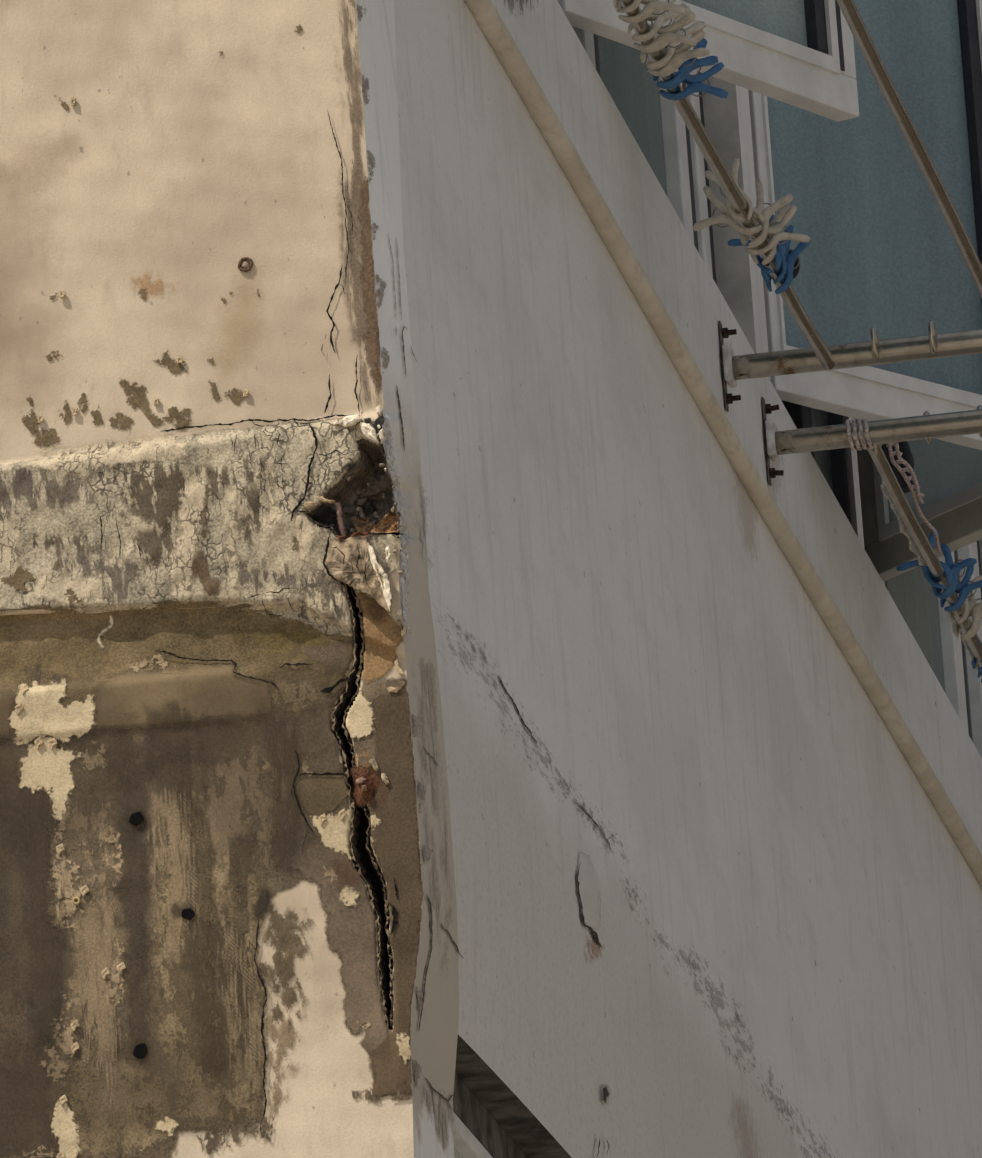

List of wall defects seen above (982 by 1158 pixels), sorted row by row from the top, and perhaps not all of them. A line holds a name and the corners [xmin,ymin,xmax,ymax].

spalling [362,75,370,104]
peeling [153,350,186,375]
crack [161,110,360,523]
peeling [358,150,390,391]
water stain [0,462,186,647]
peeling [0,377,411,756]
water stain [205,457,266,544]
crack [158,535,463,1030]
flaking render [296,775,348,820]
peeling [70,1019,80,1054]
peeling [101,962,126,980]
flaking render [288,841,389,1089]